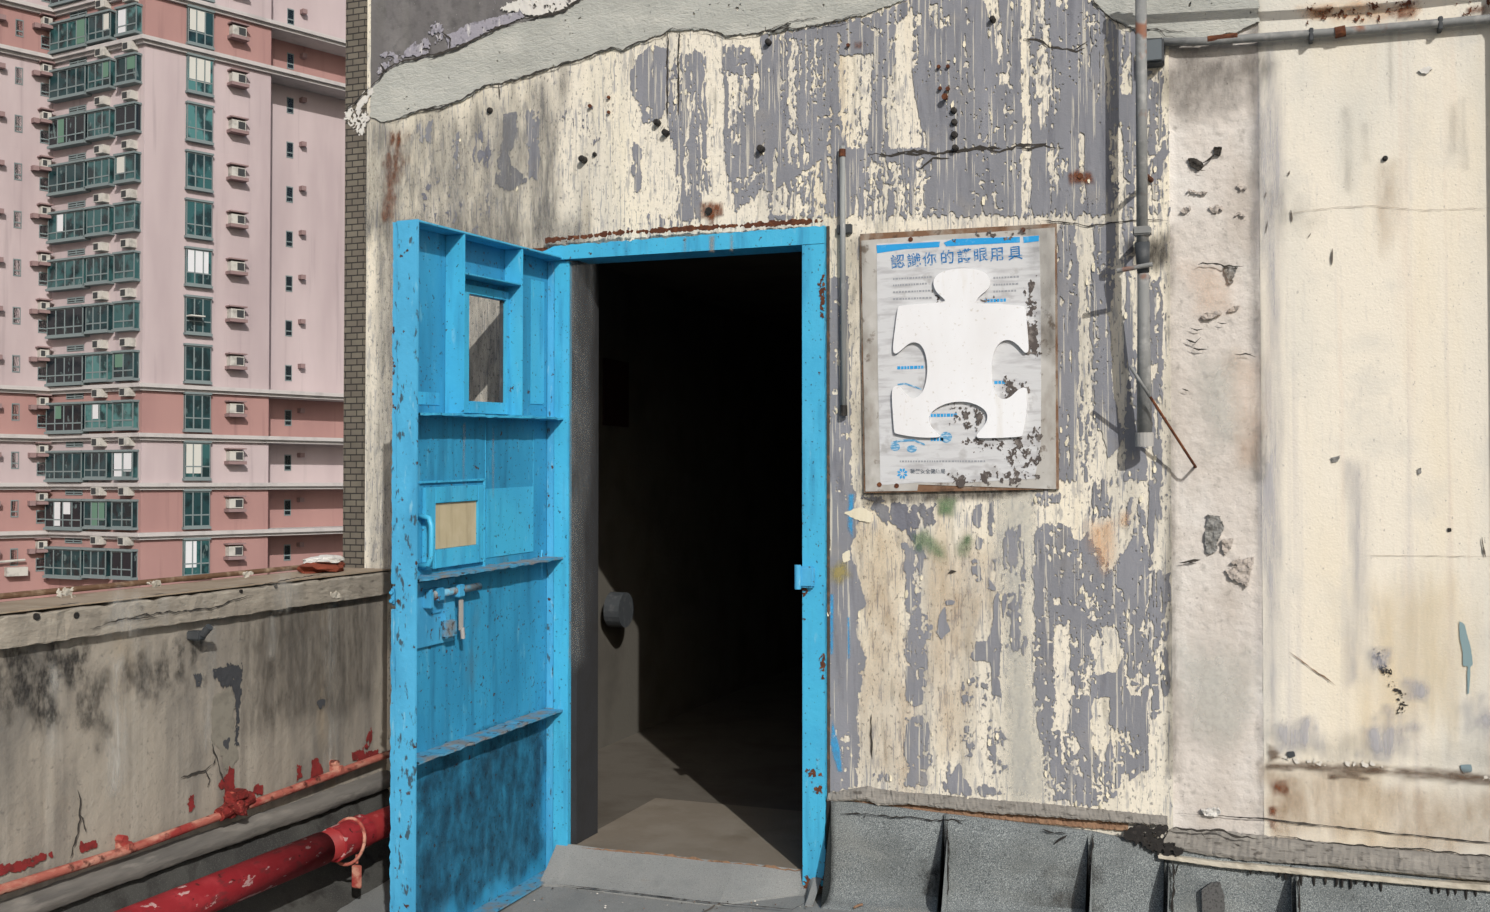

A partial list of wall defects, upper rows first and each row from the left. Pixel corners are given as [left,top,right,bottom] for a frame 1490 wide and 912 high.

corrosion [1305,0,1425,24]
peeling [417,119,433,144]
peeling [421,100,601,242]
crack [870,143,1064,169]
spalling [1188,147,1222,171]
corrosion [532,203,823,252]
peeling [610,0,1172,809]
spalling [1205,515,1254,587]
mould [0,642,86,722]
peeling [193,662,243,750]